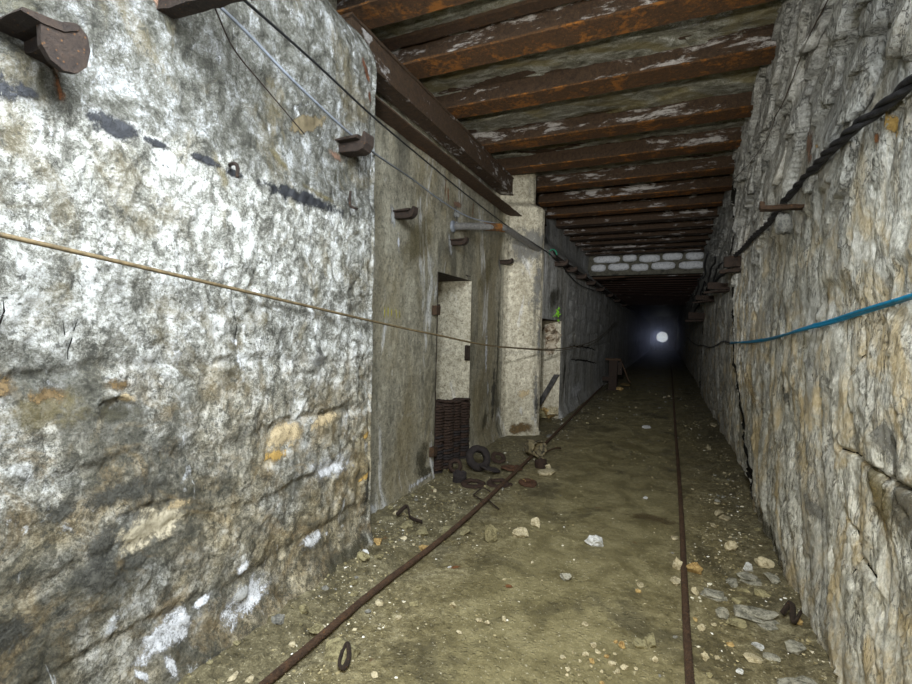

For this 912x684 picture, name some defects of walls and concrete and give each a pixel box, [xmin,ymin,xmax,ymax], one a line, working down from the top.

crack [730,172,753,499]
crack [843,448,912,491]